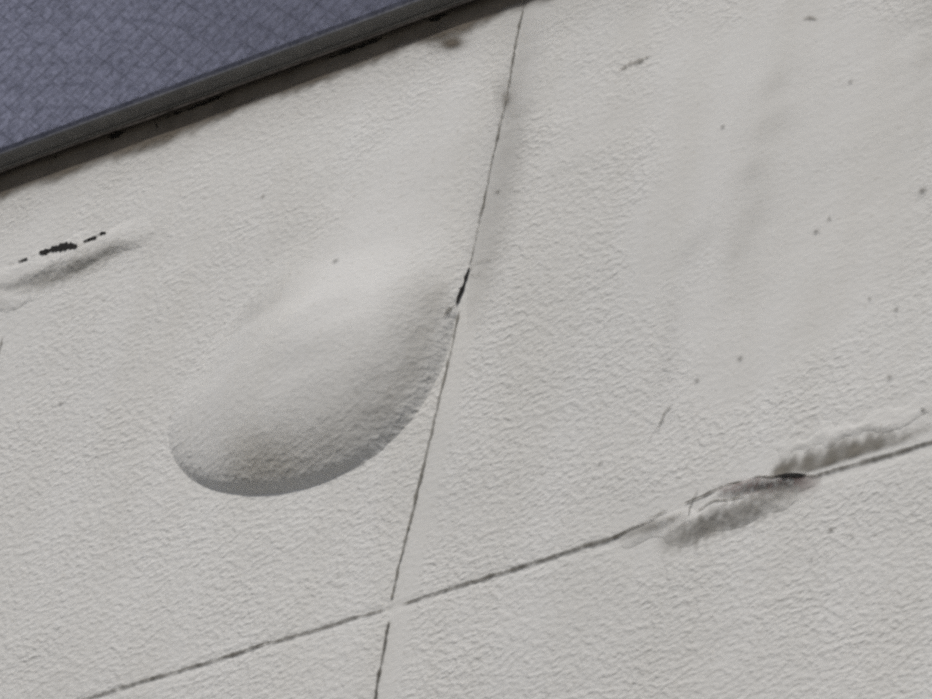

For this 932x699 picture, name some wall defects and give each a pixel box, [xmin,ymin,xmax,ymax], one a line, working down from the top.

crack [481,4,524,213]
spalling [39,231,106,254]
crack [96,252,651,699]
peeling [619,471,817,548]
crack [809,441,932,477]